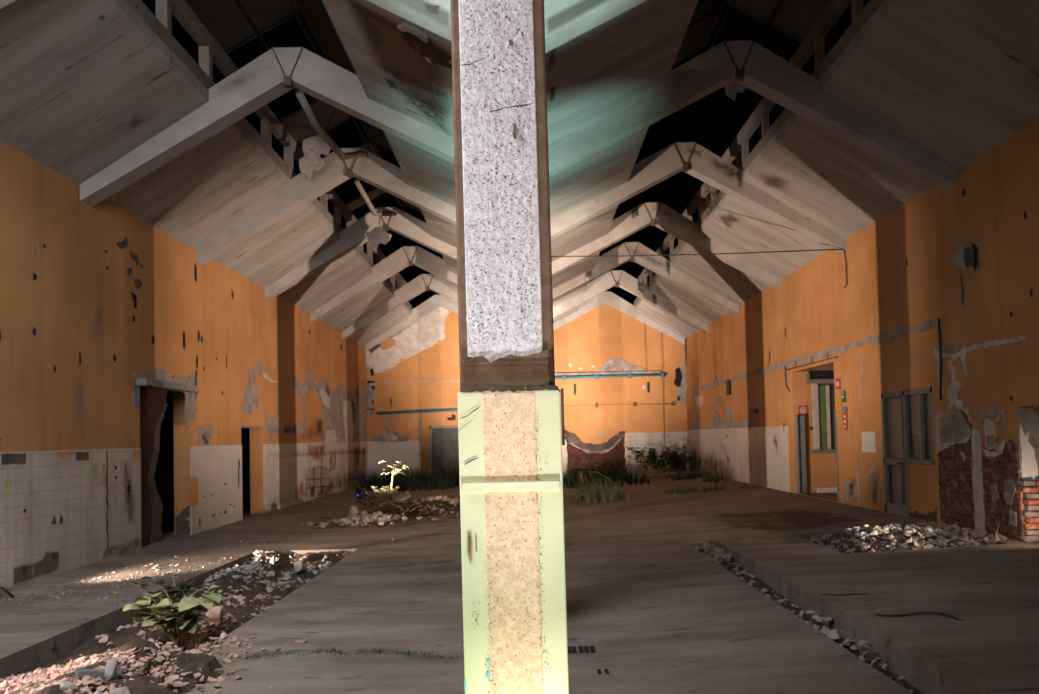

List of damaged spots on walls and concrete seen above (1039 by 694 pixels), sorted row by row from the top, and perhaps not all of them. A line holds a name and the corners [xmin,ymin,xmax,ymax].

peeling [353,0,632,476]
peeling [2,453,26,464]
flaking render [133,356,214,446]
flaking render [243,307,452,443]
flaking render [568,359,645,372]
flaking render [909,336,1039,542]